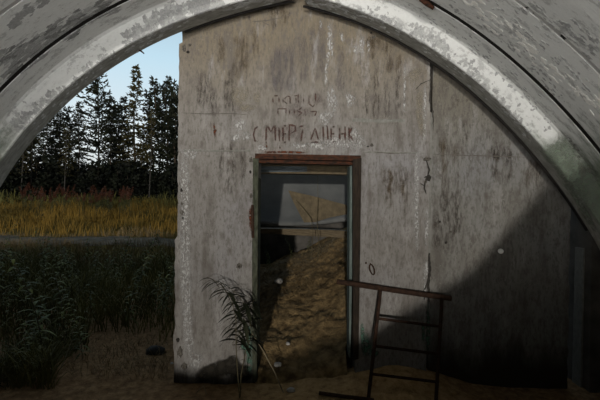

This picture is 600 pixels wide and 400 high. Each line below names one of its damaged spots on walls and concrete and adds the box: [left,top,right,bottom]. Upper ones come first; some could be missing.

peeling [0,0,284,133]
damp [320,20,337,125]
damp [293,129,364,150]
crack [415,63,434,127]
peeling [307,0,600,137]
crack [420,154,515,193]